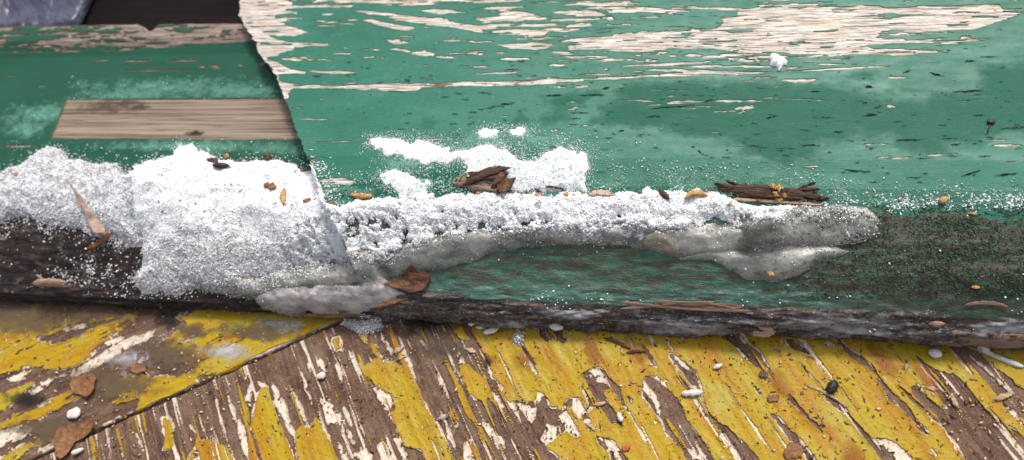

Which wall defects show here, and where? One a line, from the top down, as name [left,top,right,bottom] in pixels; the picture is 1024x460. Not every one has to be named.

peeling [0,0,1021,150]
peeling [320,178,355,191]
leakage [416,170,480,193]
peeling [0,303,1024,460]